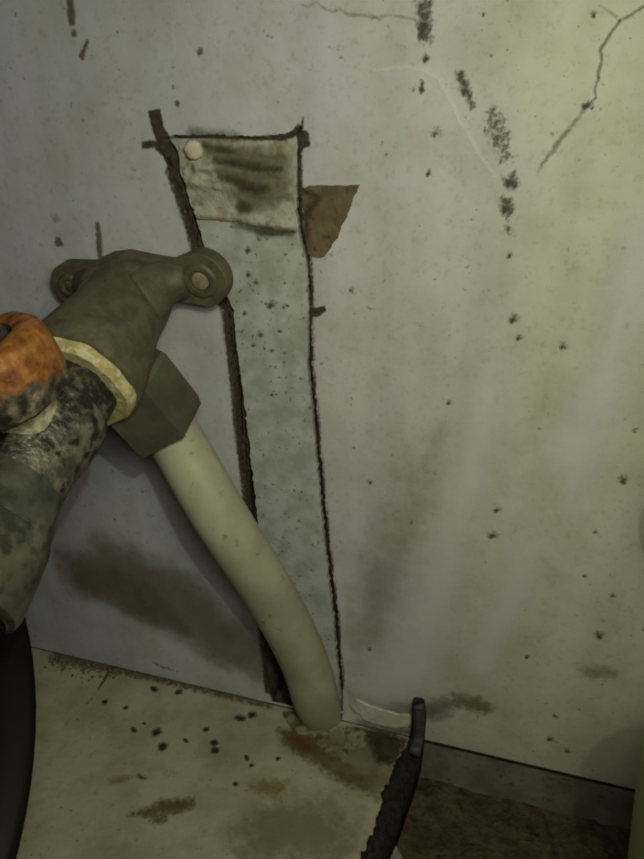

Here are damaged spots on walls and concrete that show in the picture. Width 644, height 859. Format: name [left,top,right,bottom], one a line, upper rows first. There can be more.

leakage [417,0,432,42]
crack [598,7,643,80]
leakage [458,71,475,109]
leakage [484,108,511,163]
flaking render [178,138,359,258]
leakage [500,171,518,216]